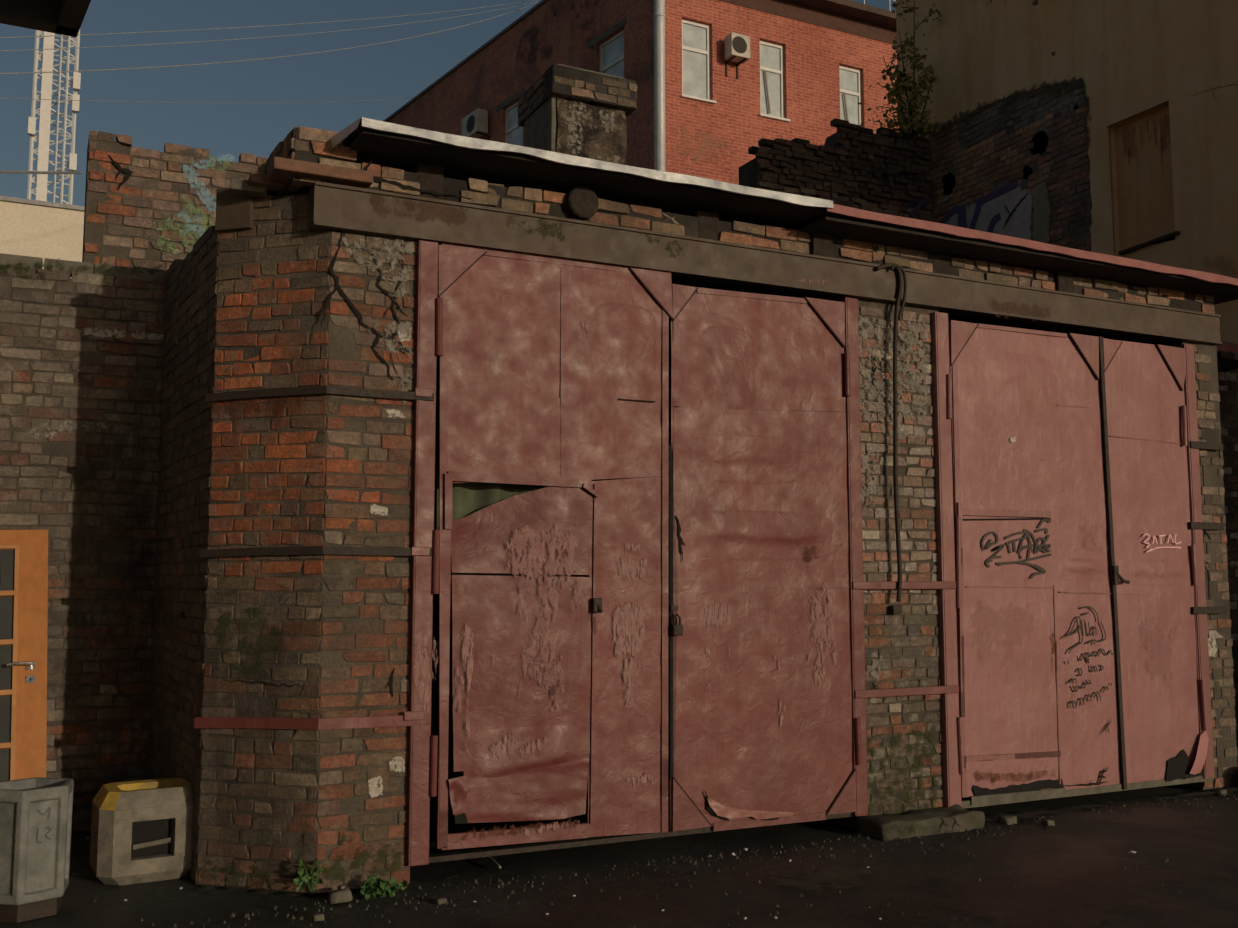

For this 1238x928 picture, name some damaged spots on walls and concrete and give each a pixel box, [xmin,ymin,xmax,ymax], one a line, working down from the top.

crack [321,231,408,380]
peeling [413,630,438,714]
peeling [505,524,584,712]
peeling [611,600,645,708]
peeling [808,582,839,687]